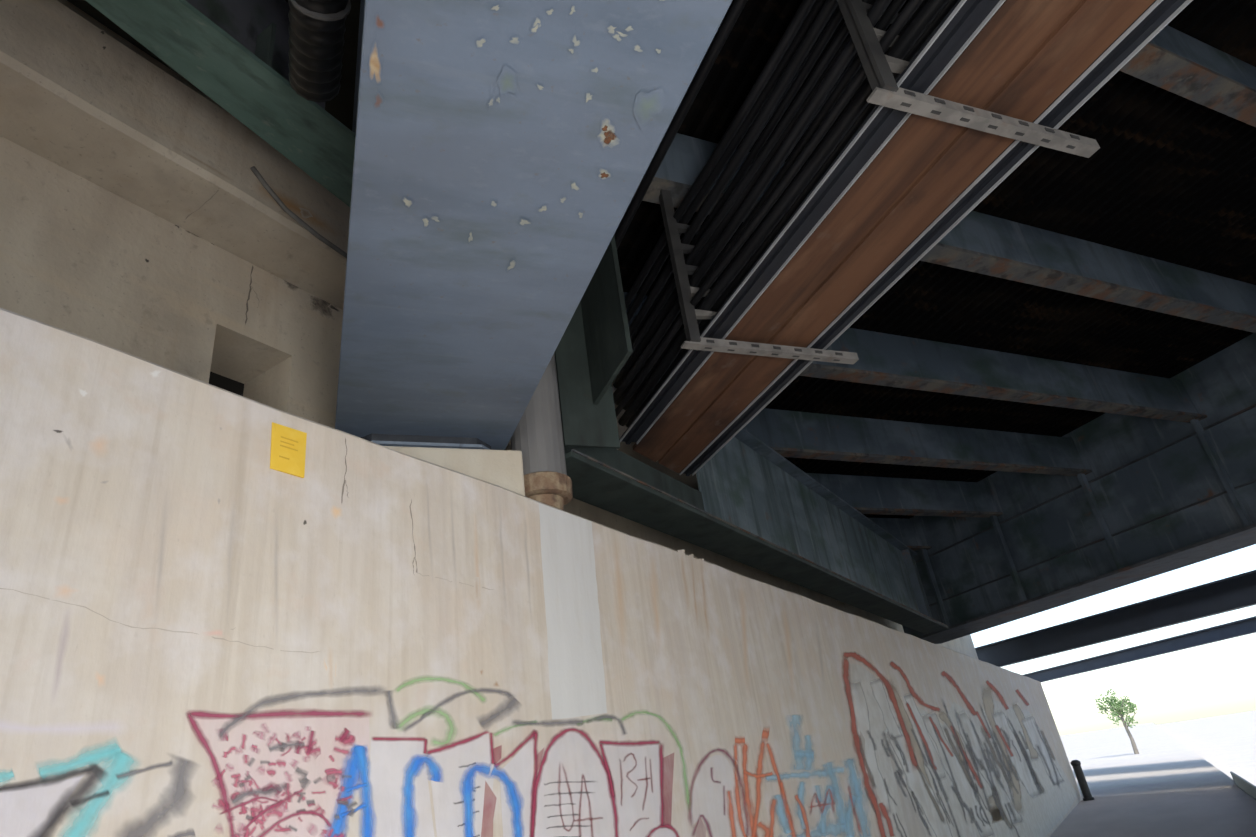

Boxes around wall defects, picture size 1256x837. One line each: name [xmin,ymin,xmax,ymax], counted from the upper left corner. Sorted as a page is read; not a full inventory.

peeling [508,4,576,46]
peeling [606,24,662,54]
corrosion [596,115,622,150]
crack [245,264,260,326]
crack [340,437,348,504]